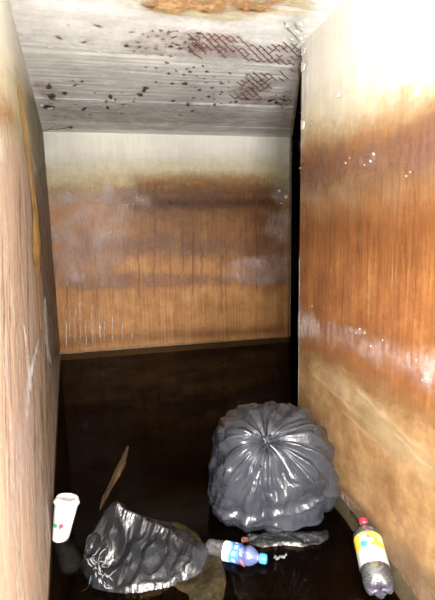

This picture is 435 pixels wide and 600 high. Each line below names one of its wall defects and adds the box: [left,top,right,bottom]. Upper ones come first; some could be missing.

rust [147,0,309,20]
leakage [0,74,291,600]
leakage [298,95,435,600]